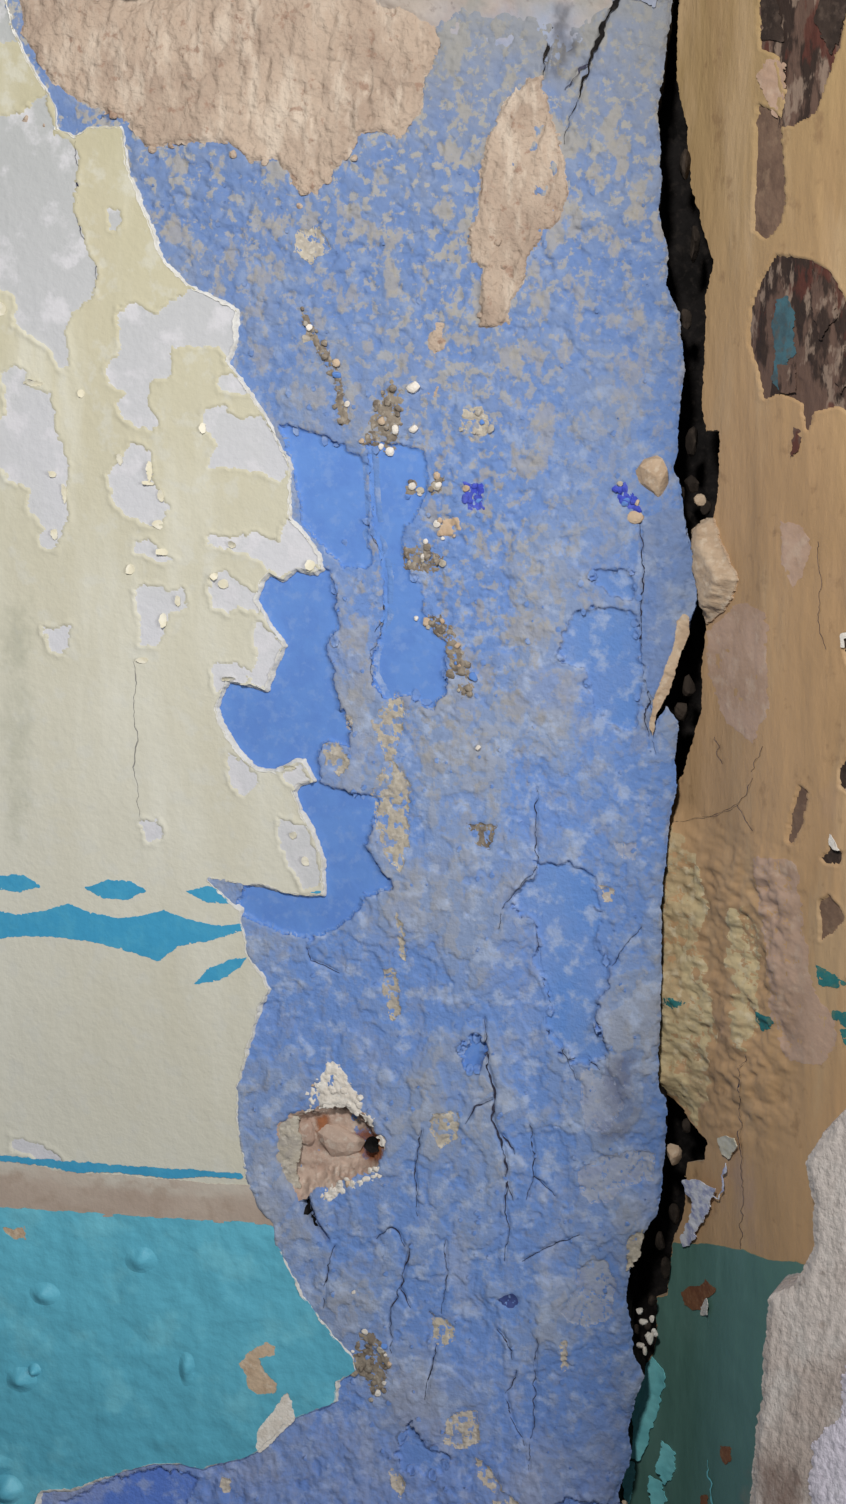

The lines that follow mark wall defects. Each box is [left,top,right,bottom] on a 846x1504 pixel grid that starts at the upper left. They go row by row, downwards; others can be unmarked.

peeling [0,95,98,368]
peeling [106,289,235,431]
crack [543,0,619,144]
crack [659,0,720,540]
peeling [750,255,846,457]
peeling [755,0,846,239]
crack [639,535,763,831]
crack [376,1130,448,1396]
crack [465,1021,578,1261]
crack [628,1056,747,1363]
flaking render [750,1109,846,1504]
peeling [647,1440,676,1504]